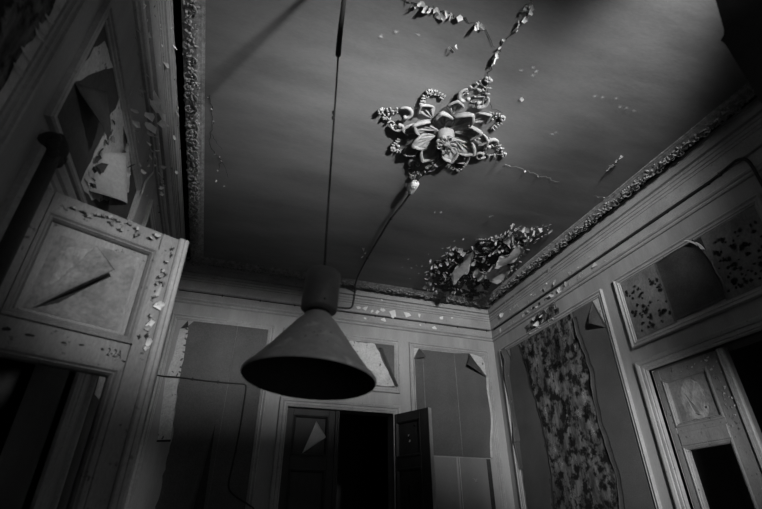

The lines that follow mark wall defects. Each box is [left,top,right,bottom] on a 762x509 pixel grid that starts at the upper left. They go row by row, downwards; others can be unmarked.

flaking render [75,41,113,82]
flaking render [81,87,174,202]
peeling [401,223,553,302]
peeling [137,247,175,351]
spalling [356,299,421,326]
peeling [499,267,583,334]
flaking render [349,341,394,386]